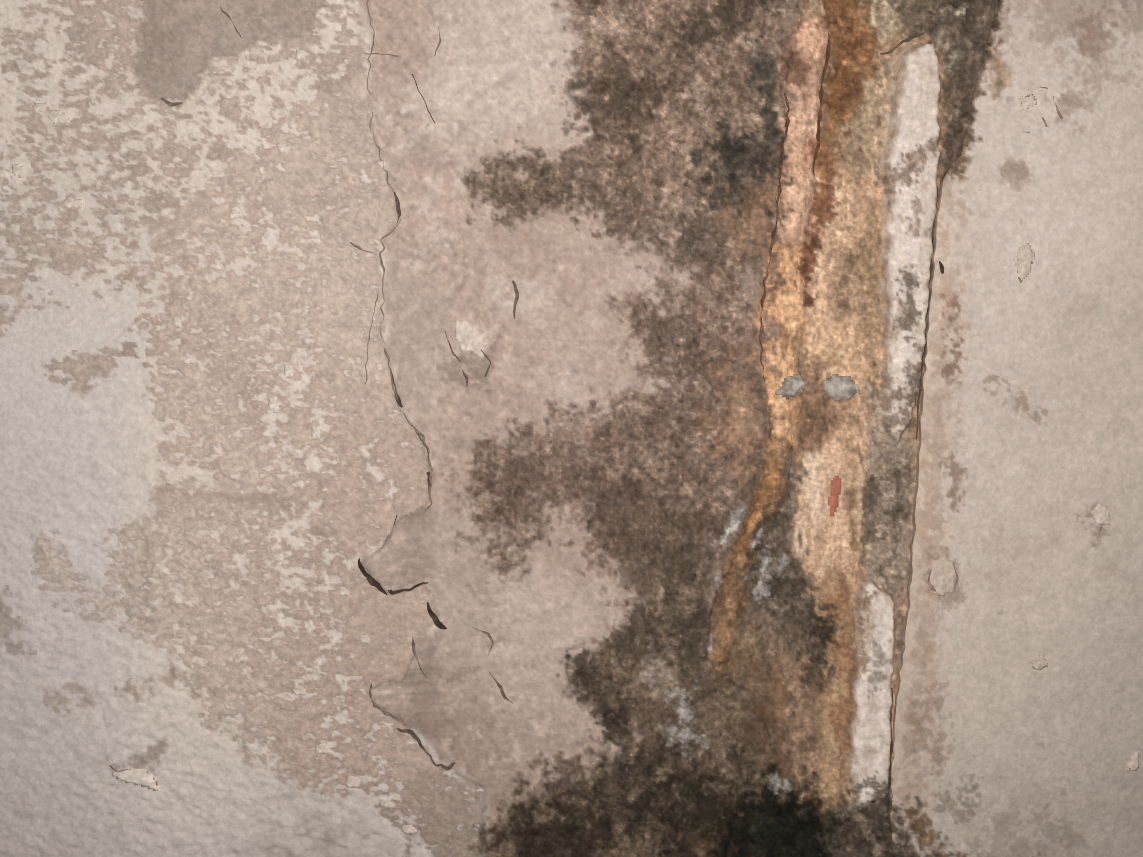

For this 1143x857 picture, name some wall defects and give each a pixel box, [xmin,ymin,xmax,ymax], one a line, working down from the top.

peeling [0,0,487,857]
crack [350,0,435,512]
flaking render [445,320,495,387]
crack [511,280,519,319]
leakage [465,0,964,857]
rust [702,346,795,676]
rust [724,178,783,273]
rust [798,0,878,307]
crack [916,186,944,439]
leakage [880,0,1000,177]
crack [473,627,512,703]